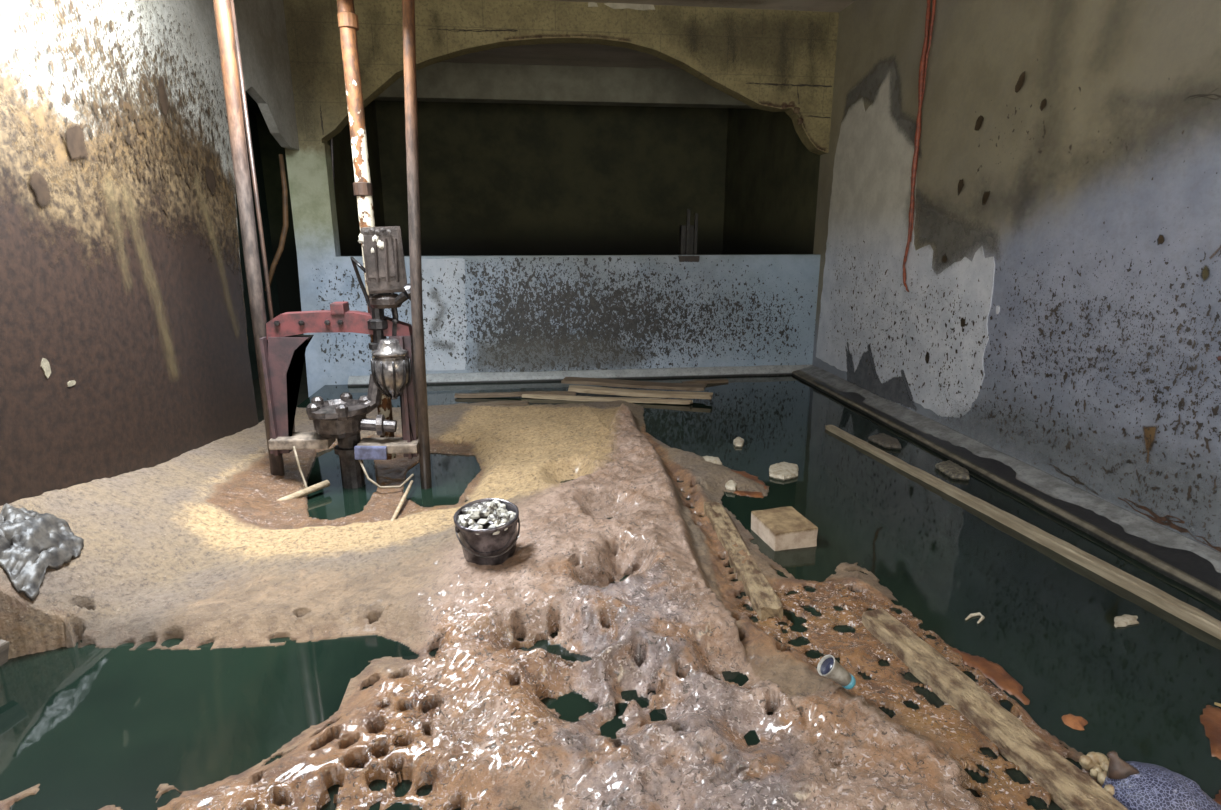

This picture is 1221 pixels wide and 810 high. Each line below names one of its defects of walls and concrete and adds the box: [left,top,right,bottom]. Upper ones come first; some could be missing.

peeling [816,59,1000,418]
rust [1143,426,1157,463]